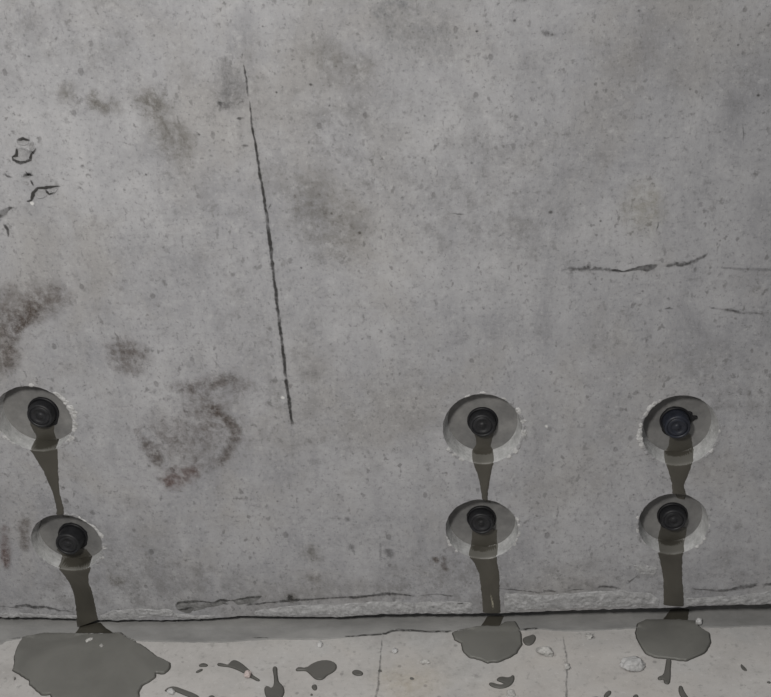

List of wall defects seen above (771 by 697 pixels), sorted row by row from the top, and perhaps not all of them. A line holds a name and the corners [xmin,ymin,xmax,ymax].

peeling [12,137,59,202]
crack [238,108,293,423]
crack [572,255,705,272]
damp [30,422,70,518]
damp [472,432,494,502]
damp [664,434,694,499]
damp [635,526,711,685]